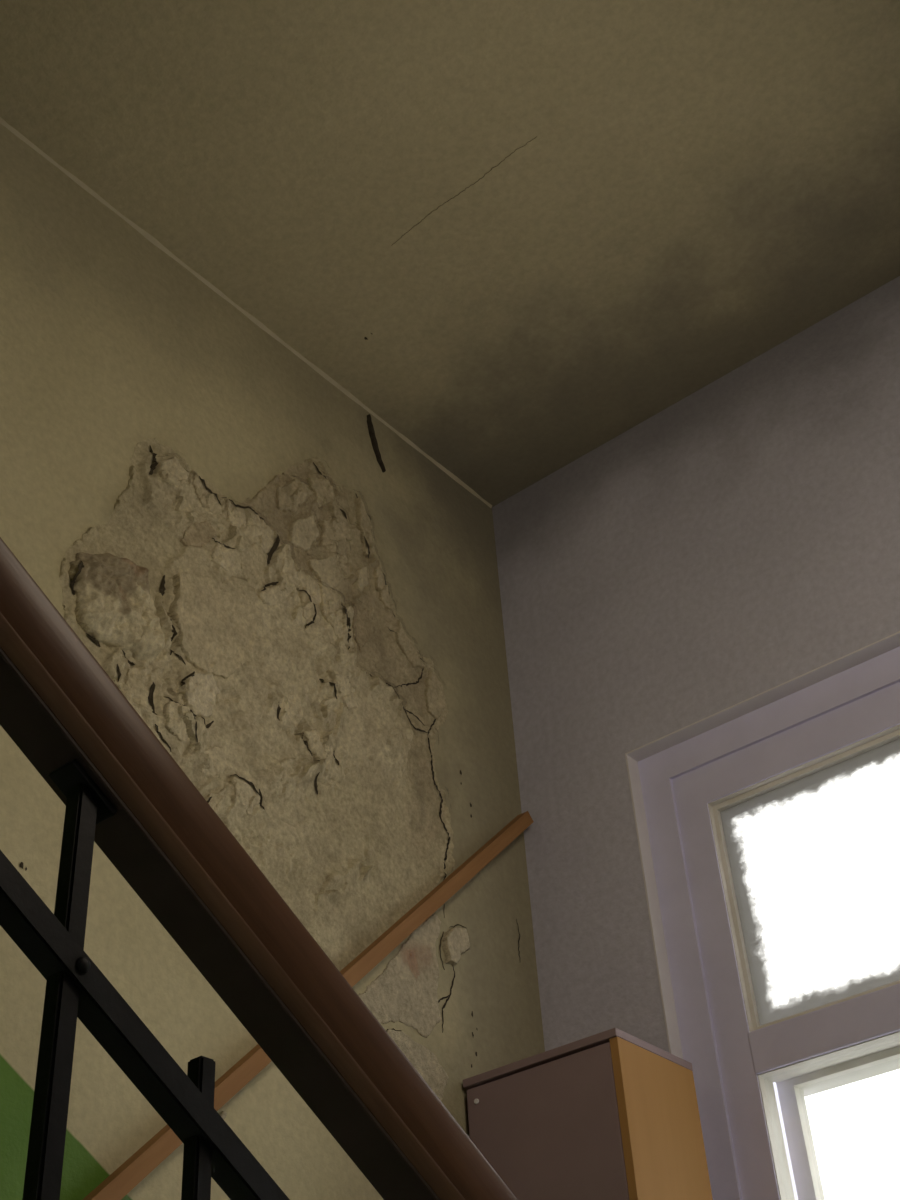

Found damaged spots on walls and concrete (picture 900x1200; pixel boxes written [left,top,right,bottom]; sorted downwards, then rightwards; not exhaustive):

flaking render [367,414,386,472]
peeling [59,438,455,972]
peeling [358,914,470,1101]